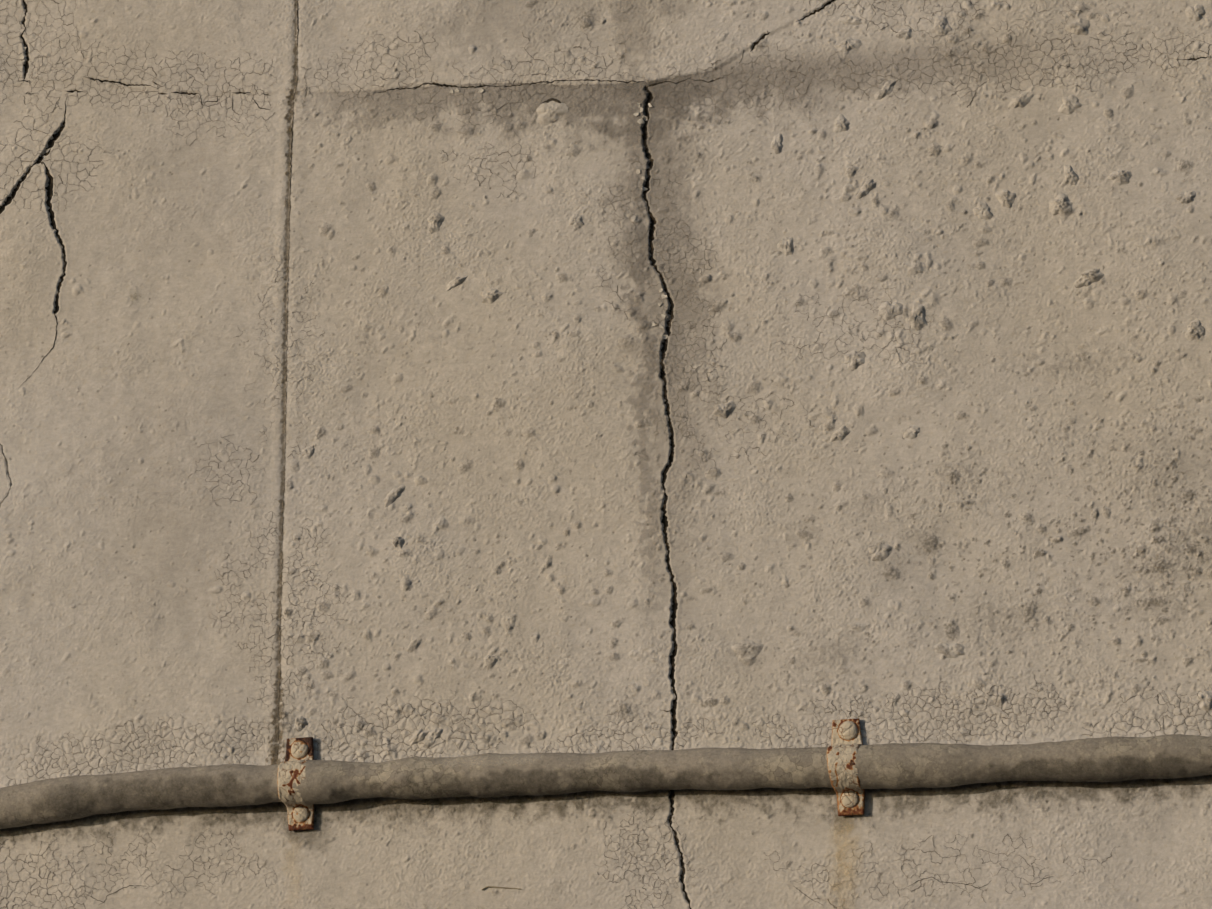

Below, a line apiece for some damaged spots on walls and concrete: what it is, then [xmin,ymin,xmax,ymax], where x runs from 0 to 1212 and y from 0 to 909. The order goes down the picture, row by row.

crack [0,444,12,507]
crack [0,0,277,383]
crack [8,256,350,785]
crack [294,0,1212,763]
crack [597,790,706,909]